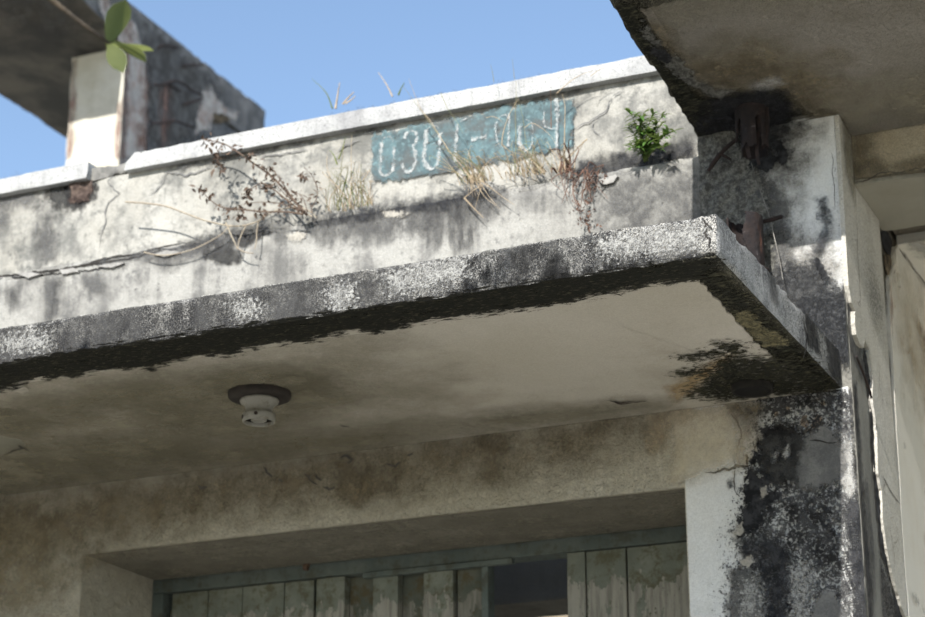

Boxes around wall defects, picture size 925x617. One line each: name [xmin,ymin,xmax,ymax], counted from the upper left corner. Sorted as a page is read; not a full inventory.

peeling [99,0,111,18]
spalling [117,20,239,157]
leakage [573,24,848,228]
spalling [46,180,99,212]
crack [0,173,183,280]
leakage [300,187,507,250]
crack [882,247,925,320]
leakage [0,191,902,617]